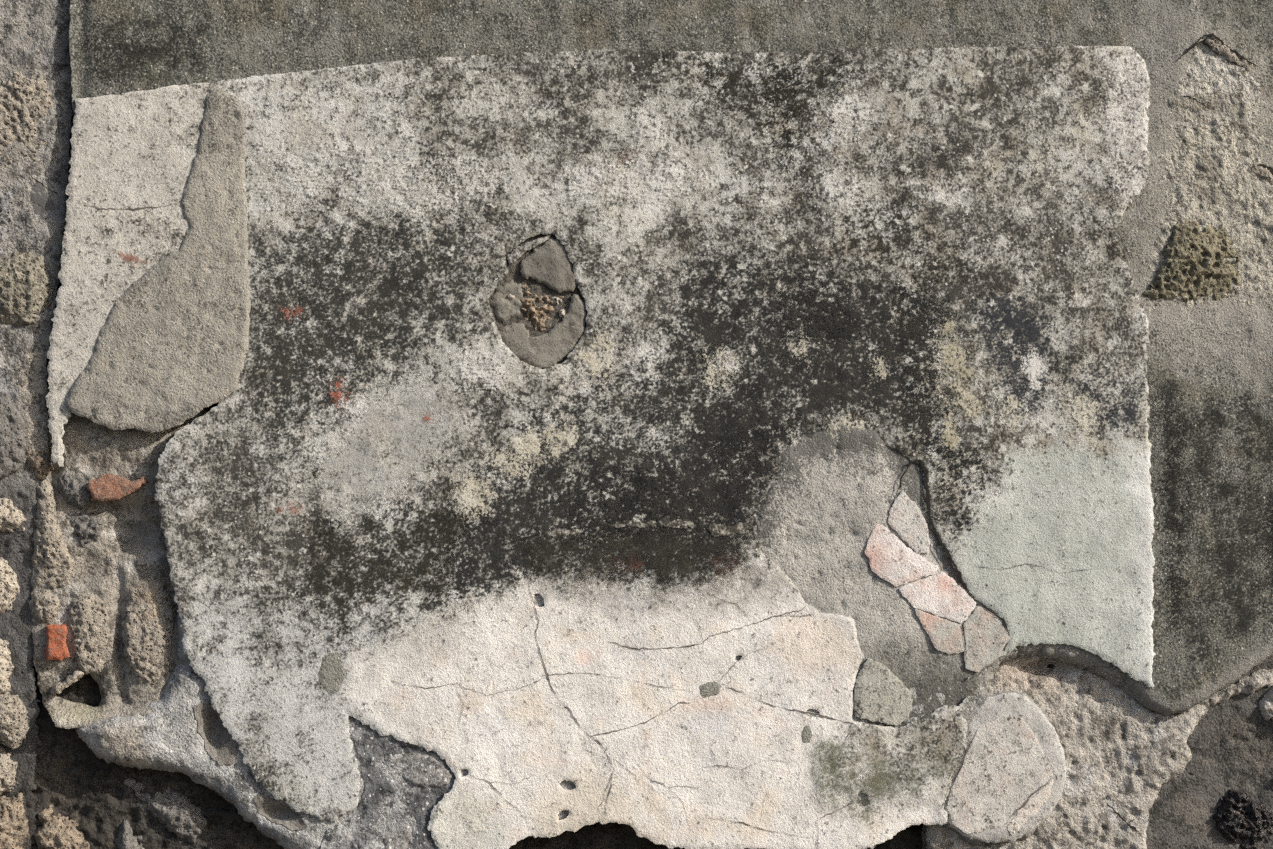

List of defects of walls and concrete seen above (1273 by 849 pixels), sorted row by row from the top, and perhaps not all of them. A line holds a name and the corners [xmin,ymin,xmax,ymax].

crack [1177,33,1258,67]
leakage [243,135,515,477]
spalling [489,234,588,369]
leakage [291,187,1273,669]
spalling [194,703,239,765]
spalling [253,795,306,830]
spalling [320,716,456,849]
crack [394,585,890,847]
crack [945,726,971,817]